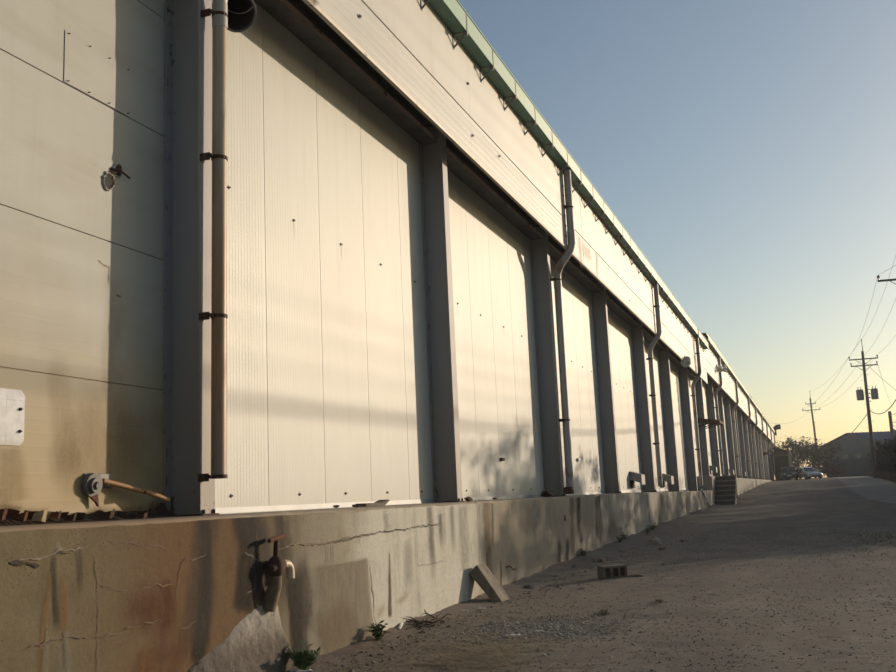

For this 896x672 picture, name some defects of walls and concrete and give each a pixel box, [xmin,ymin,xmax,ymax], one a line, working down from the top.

crack [10,546,206,672]
damp [192,520,212,660]
damp [236,517,267,611]
damp [289,568,311,653]
crack [282,518,443,615]
damp [558,497,582,563]